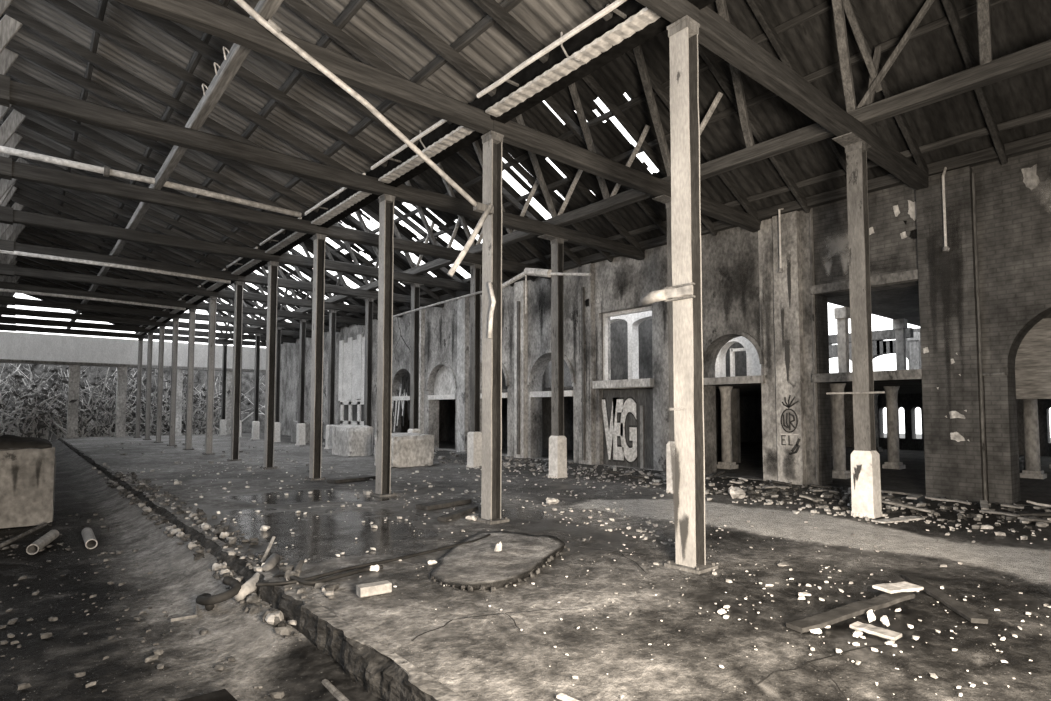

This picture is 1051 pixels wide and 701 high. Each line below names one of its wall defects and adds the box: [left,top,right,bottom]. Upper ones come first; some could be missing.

flaking render [893,200,916,221]
leakage [616,271,630,299]
spalling [950,432,969,442]